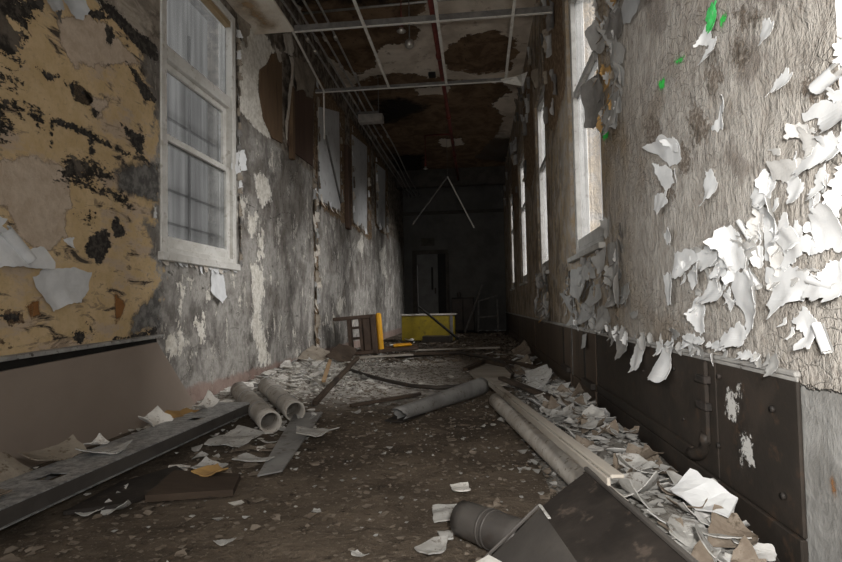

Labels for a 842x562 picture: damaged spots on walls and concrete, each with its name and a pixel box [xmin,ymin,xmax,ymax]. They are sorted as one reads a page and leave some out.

flaking render [0,154,132,312]
flaking render [0,0,158,144]
peeling [120,122,152,165]
peeling [158,12,369,399]
peeling [299,0,565,260]
peeling [560,0,842,383]
peeling [0,309,25,327]
peeling [72,321,96,344]
peeling [112,326,157,340]